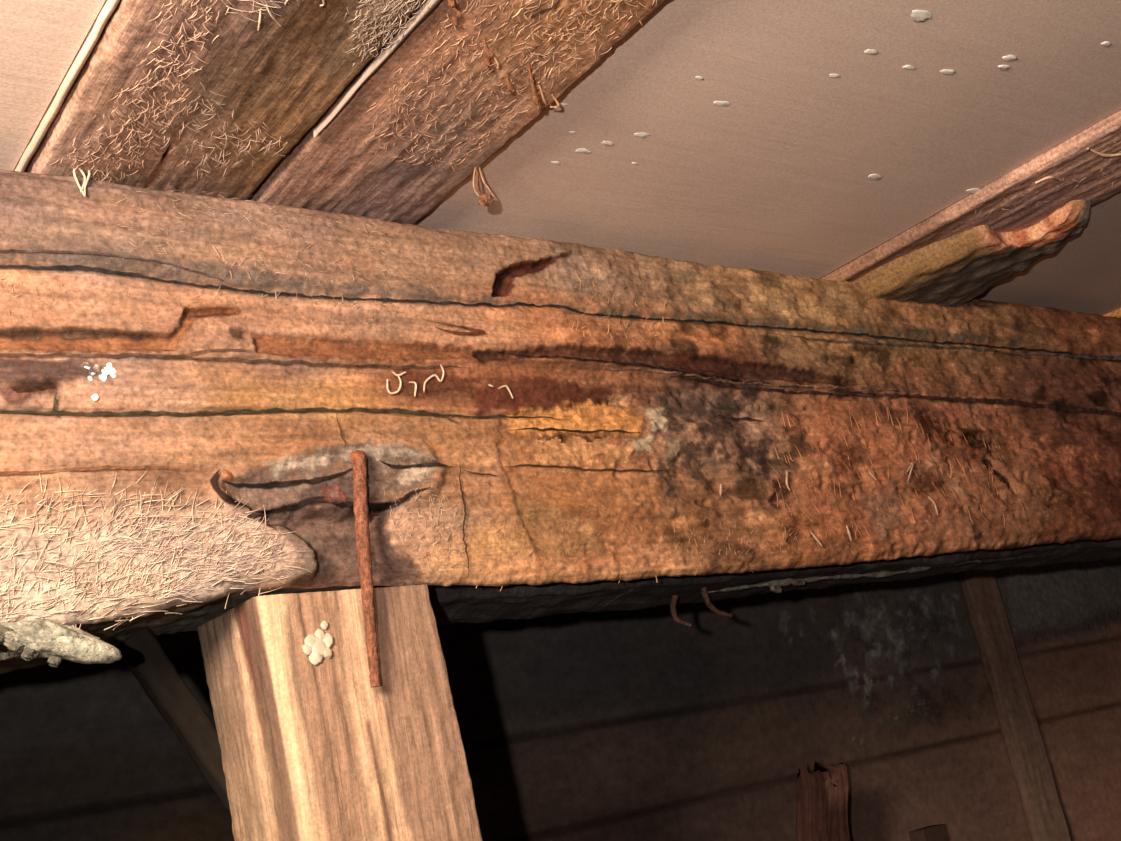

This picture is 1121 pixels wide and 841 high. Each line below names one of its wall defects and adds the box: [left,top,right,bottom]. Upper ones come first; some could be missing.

damp [0,246,517,307]
damp [655,388,787,513]
damp [701,567,993,731]